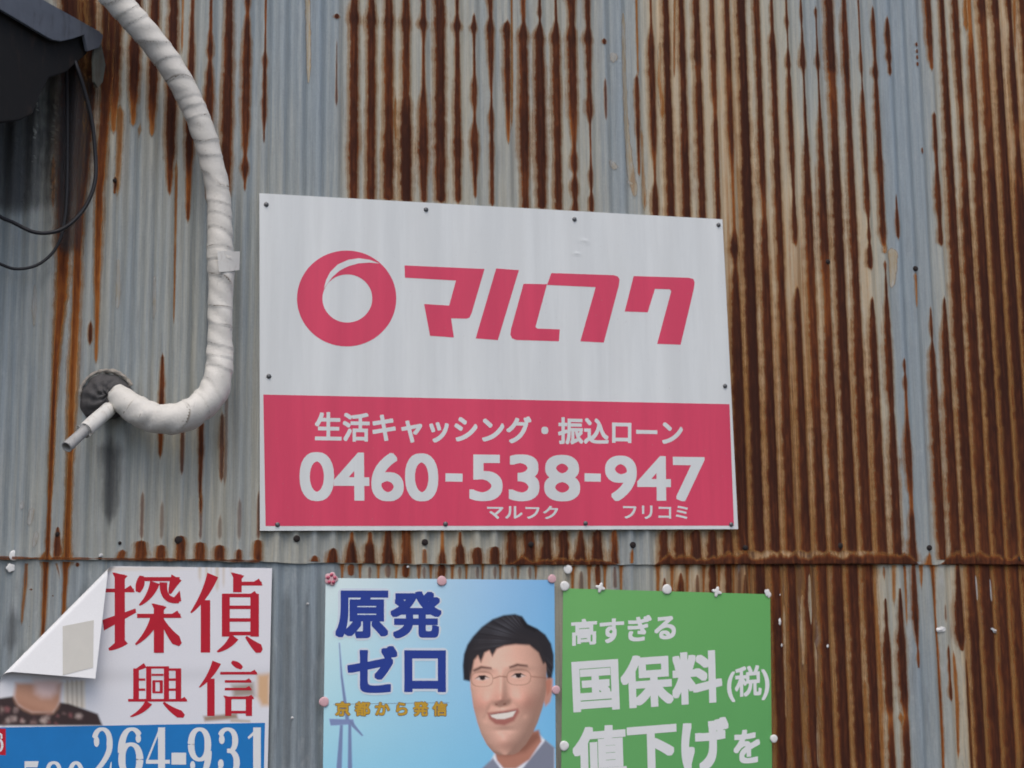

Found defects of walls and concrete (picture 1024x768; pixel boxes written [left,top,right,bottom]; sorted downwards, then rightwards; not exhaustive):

rust [0,0,268,636]
rust [334,0,607,212]
rust [311,530,634,590]
rust [634,0,1024,768]